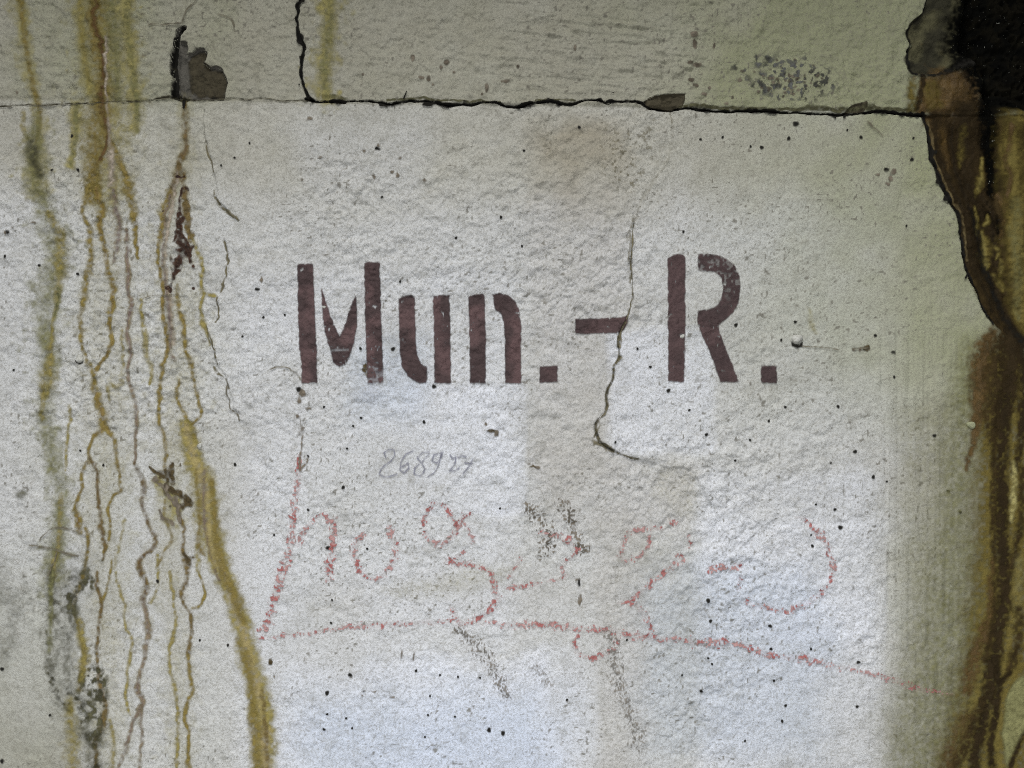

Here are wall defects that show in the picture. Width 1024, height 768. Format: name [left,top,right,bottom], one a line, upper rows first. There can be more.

leakage [16,0,46,196]
leakage [66,0,93,168]
leakage [115,0,144,133]
spalling [170,25,228,102]
crack [0,0,1023,343]
spalling [905,0,976,76]
leakage [41,210,64,400]
crack [593,225,638,460]
corrosion [908,0,1024,768]
leakage [48,500,62,652]
leakage [78,619,88,681]
leakage [180,420,276,768]